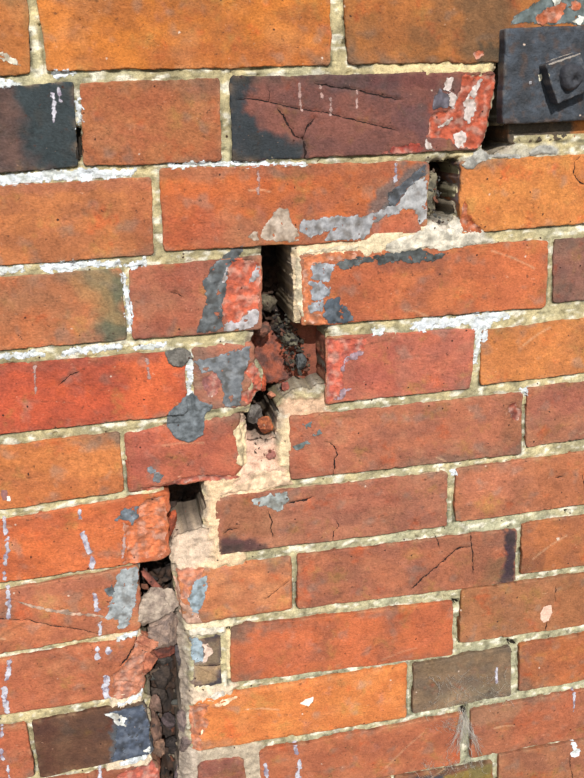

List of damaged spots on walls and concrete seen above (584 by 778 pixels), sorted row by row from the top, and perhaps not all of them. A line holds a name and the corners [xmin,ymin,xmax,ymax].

spalling [382,74,495,155]
peeling [248,165,428,243]
spalling [197,246,262,334]
crack [261,245,282,331]
crack [167,482,200,515]
leakage [2,516,12,619]
crack [139,555,172,597]
spalling [104,466,240,629]
leakage [94,630,138,660]
leakage [1,659,12,714]
leakage [101,675,143,707]
crack [119,623,177,778]